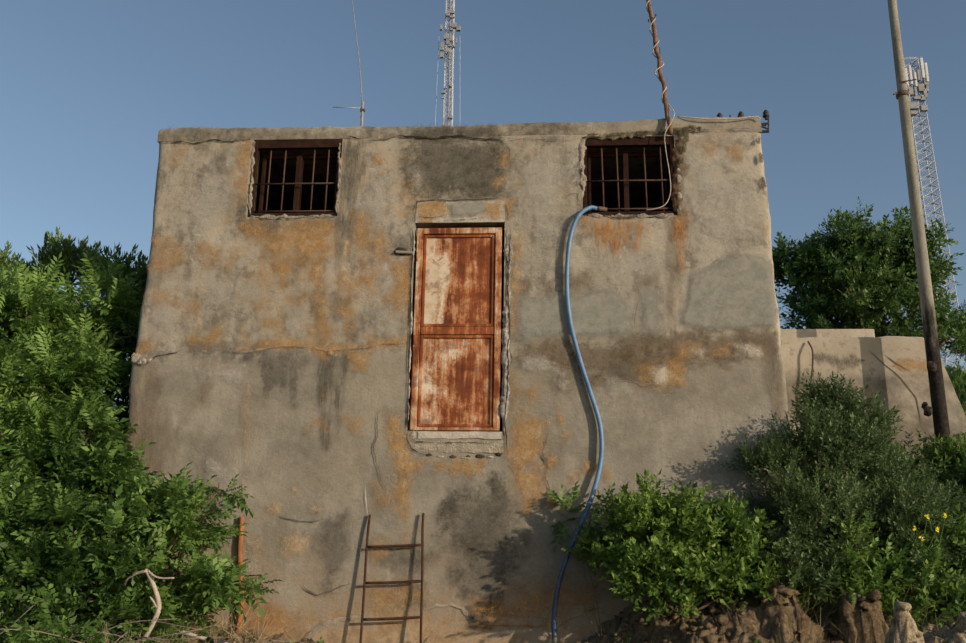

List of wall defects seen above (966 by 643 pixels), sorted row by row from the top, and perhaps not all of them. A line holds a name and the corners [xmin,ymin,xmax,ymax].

leakage [401,127,512,202]
crack [218,197,512,455]
peeling [655,367,667,383]
leakage [441,474,526,629]